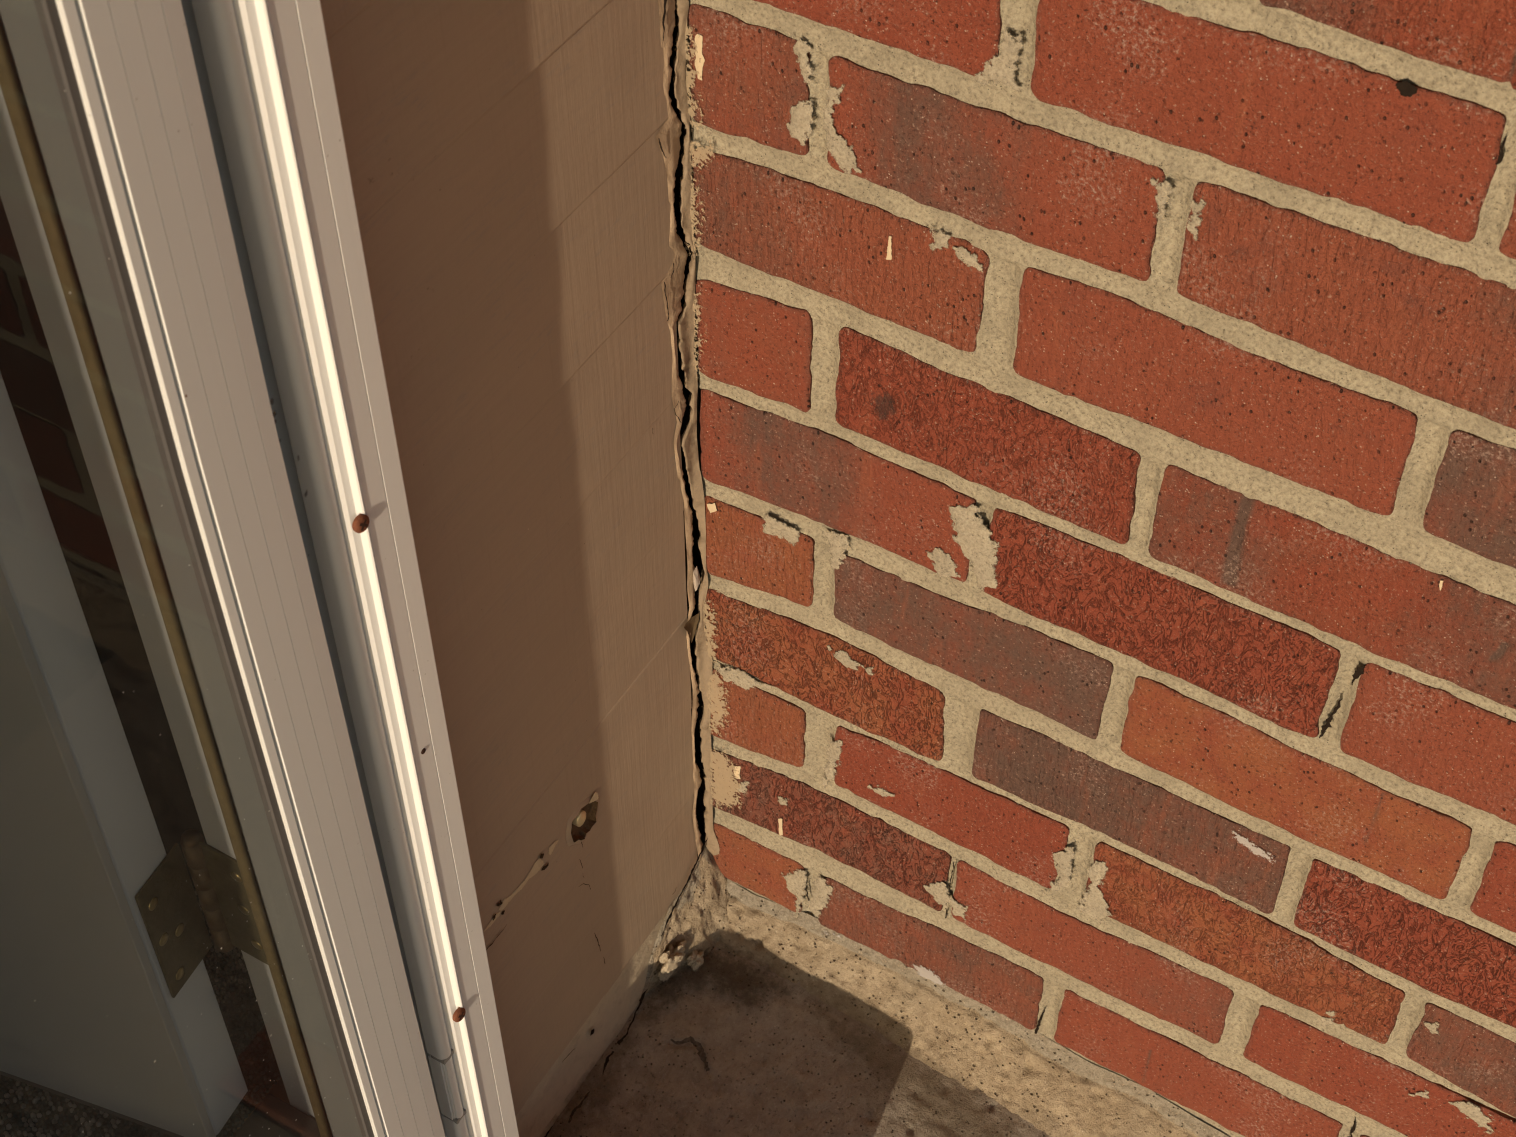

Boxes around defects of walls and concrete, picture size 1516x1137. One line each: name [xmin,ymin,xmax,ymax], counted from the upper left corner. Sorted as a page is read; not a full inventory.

peeling [484,792,598,932]
crack [658,0,721,936]